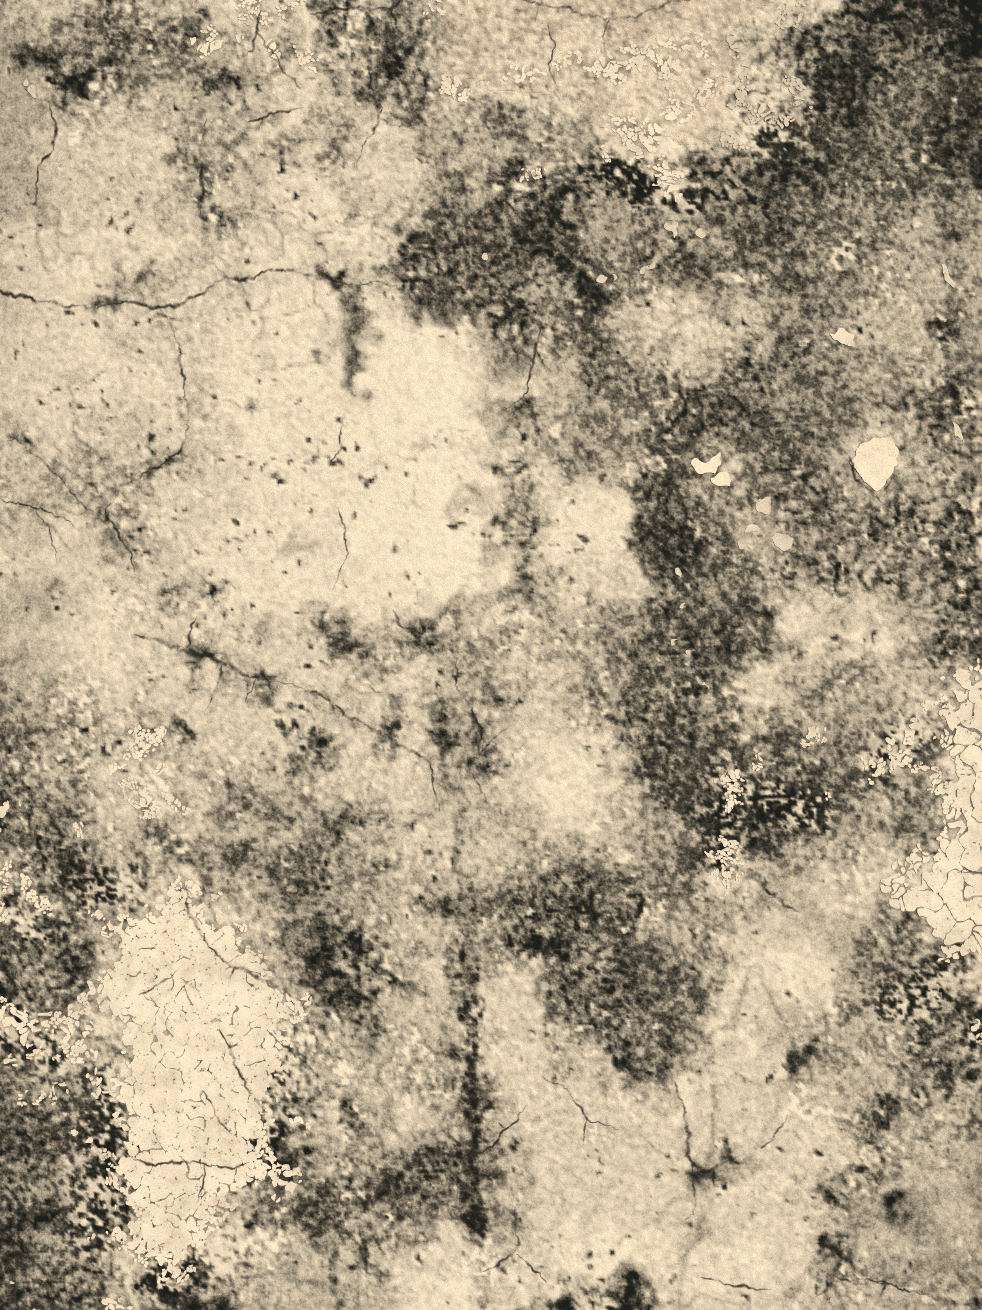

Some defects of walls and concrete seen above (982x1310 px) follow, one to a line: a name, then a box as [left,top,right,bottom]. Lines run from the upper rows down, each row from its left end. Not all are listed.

damp [9,0,240,104]
crack [234,268,395,286]
crack [0,289,206,398]
crack [141,447,182,475]
crack [3,466,135,570]
damp [222,0,982,1254]
peeling [0,801,21,832]
peeling [860,658,982,963]
peeling [0,860,54,923]
damp [0,699,144,1310]
peeling [0,875,312,1283]
damp [135,1257,238,1310]